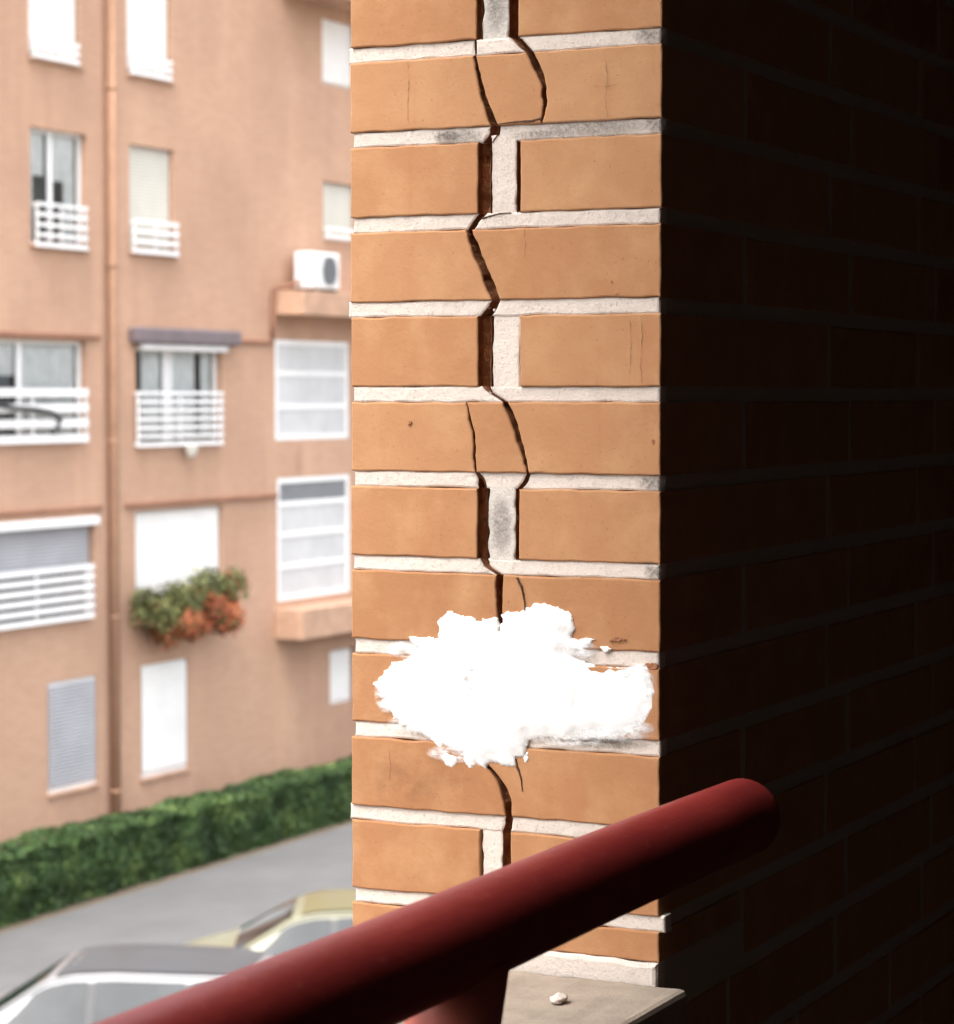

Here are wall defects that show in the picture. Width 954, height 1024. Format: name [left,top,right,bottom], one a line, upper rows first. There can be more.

crack [467,0,547,624]
crack [487,756,523,867]